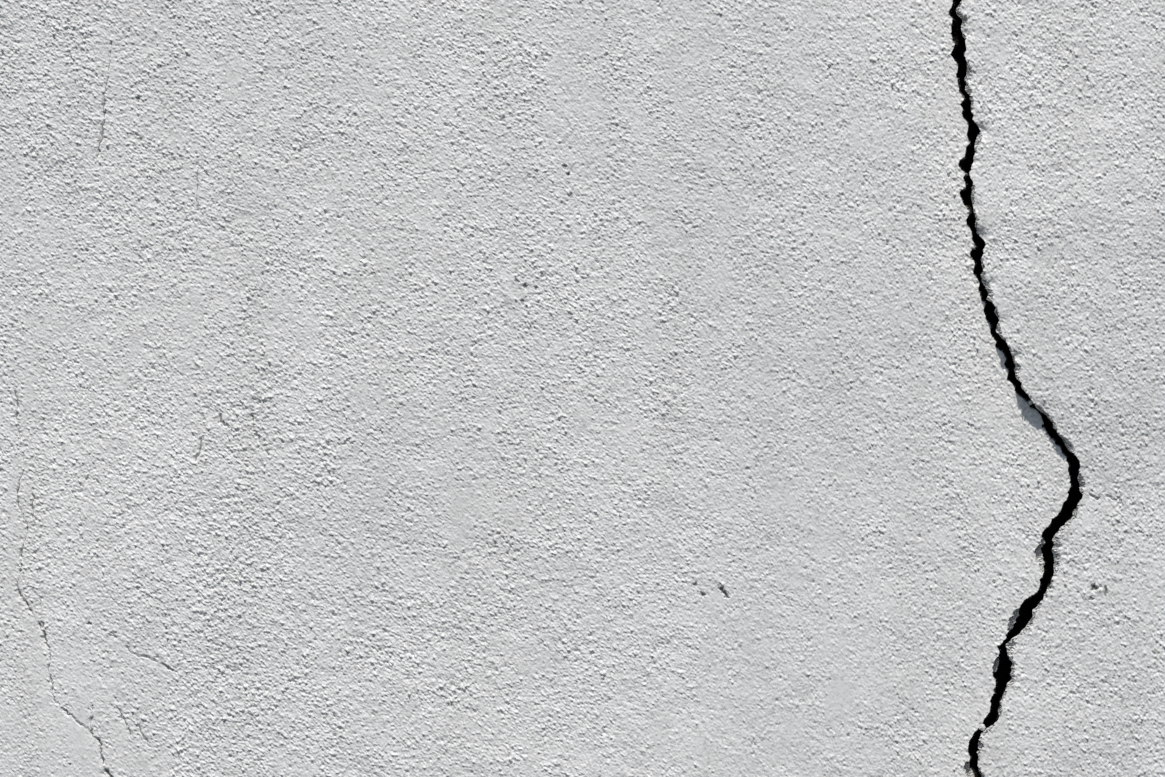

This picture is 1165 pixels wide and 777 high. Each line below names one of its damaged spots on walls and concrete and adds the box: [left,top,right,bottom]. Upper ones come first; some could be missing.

crack [949,0,1121,777]